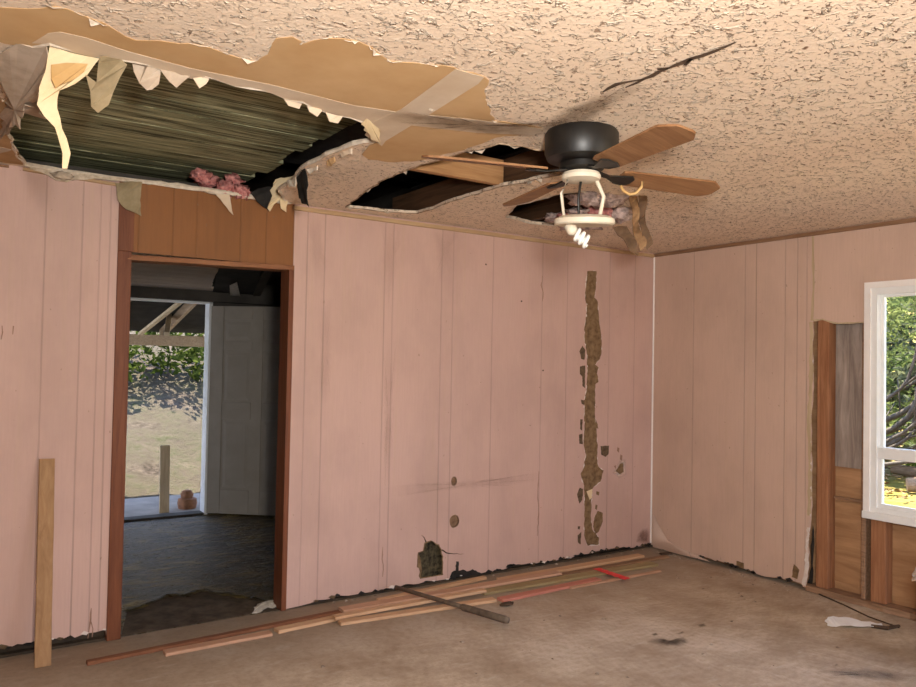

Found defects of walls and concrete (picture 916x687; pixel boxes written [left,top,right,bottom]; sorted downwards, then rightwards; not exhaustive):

peeling [193,77,210,88]
crack [603,42,736,92]
peeling [283,98,343,123]
peeling [529,271,651,565]
spalling [417,536,516,582]